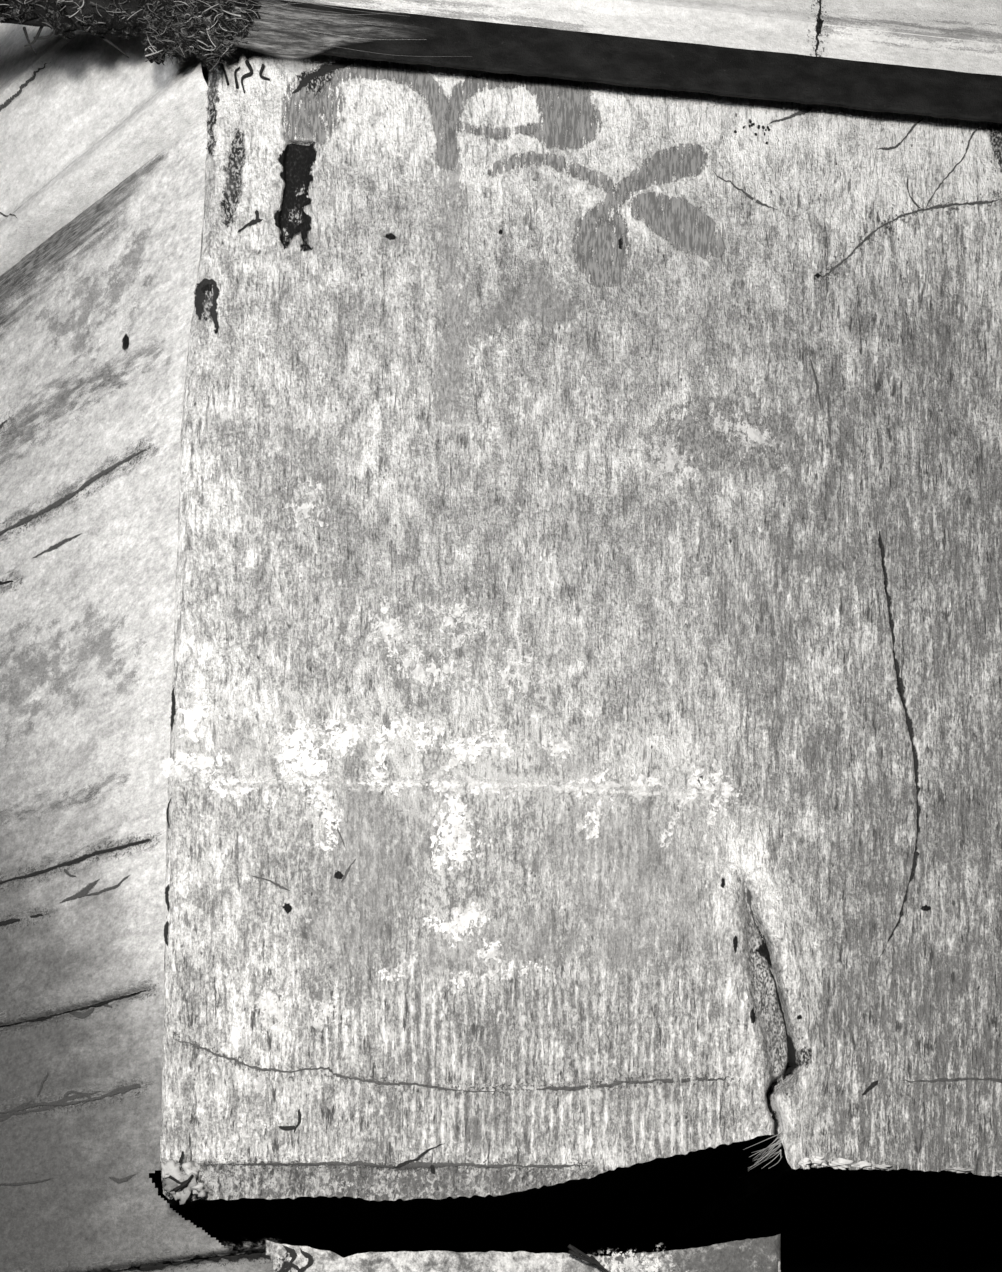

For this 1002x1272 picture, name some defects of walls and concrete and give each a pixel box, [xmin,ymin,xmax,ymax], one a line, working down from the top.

crack [807,0,829,57]
crack [879,118,924,150]
spalling [274,142,317,251]
crack [814,126,1002,289]
flaking render [194,278,219,328]
crack [872,511,921,973]
crack [0,1072,152,1122]
crack [165,1032,741,1175]
crack [862,1077,1002,1095]
crack [0,1165,53,1186]
crack [109,1174,136,1183]